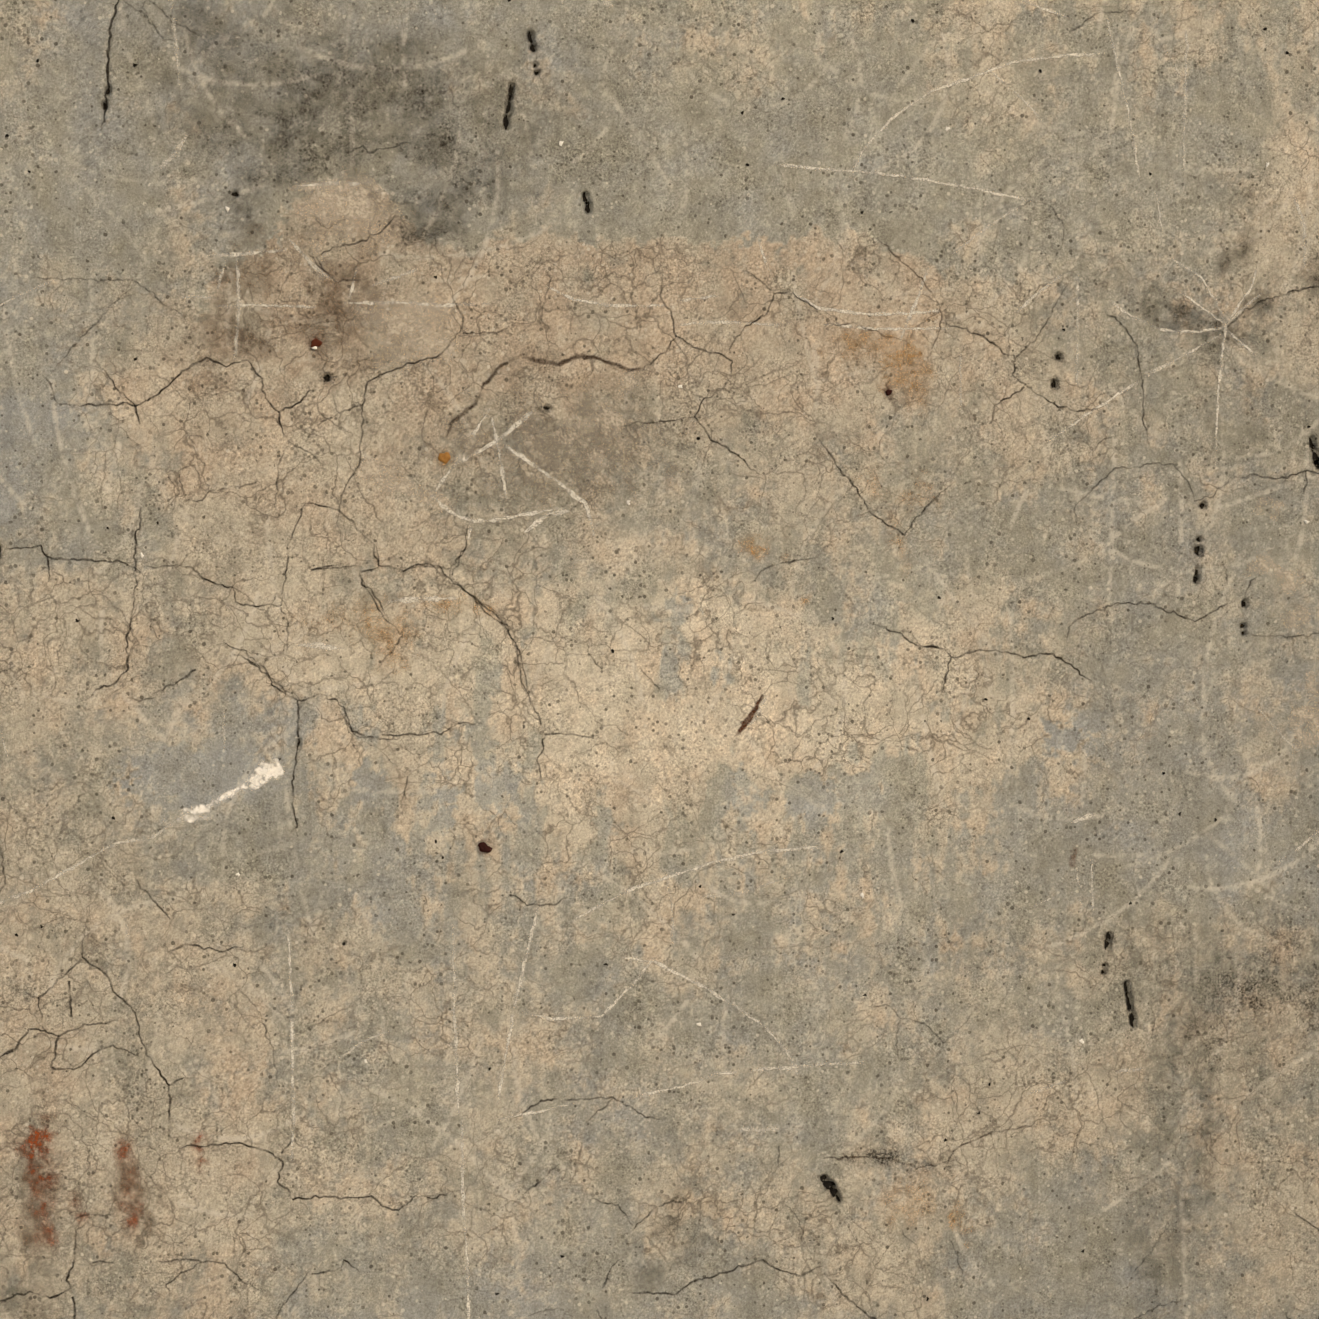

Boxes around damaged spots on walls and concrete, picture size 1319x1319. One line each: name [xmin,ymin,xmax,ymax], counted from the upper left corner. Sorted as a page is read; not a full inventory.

crack [104,0,119,120]
crack [884,244,1092,416]
damp [1173,303,1239,341]
crack [10,354,559,773]
crack [886,576,1253,689]
crack [225,643,467,828]
crack [2,953,183,1116]
rust [21,1128,56,1244]
rust [118,1147,148,1226]
crack [184,1142,446,1211]
crack [1,1245,109,1319]
crack [645,1259,876,1319]